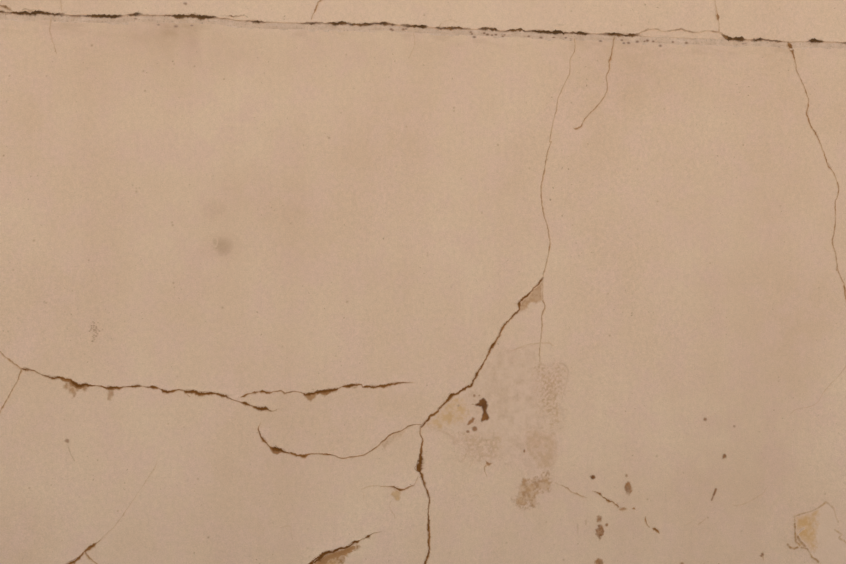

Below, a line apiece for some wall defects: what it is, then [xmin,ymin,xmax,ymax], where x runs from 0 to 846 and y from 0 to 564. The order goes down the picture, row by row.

crack [573,32,689,131]
crack [713,0,846,302]
crack [0,0,588,564]
peeling [418,334,576,511]
crack [555,482,660,534]